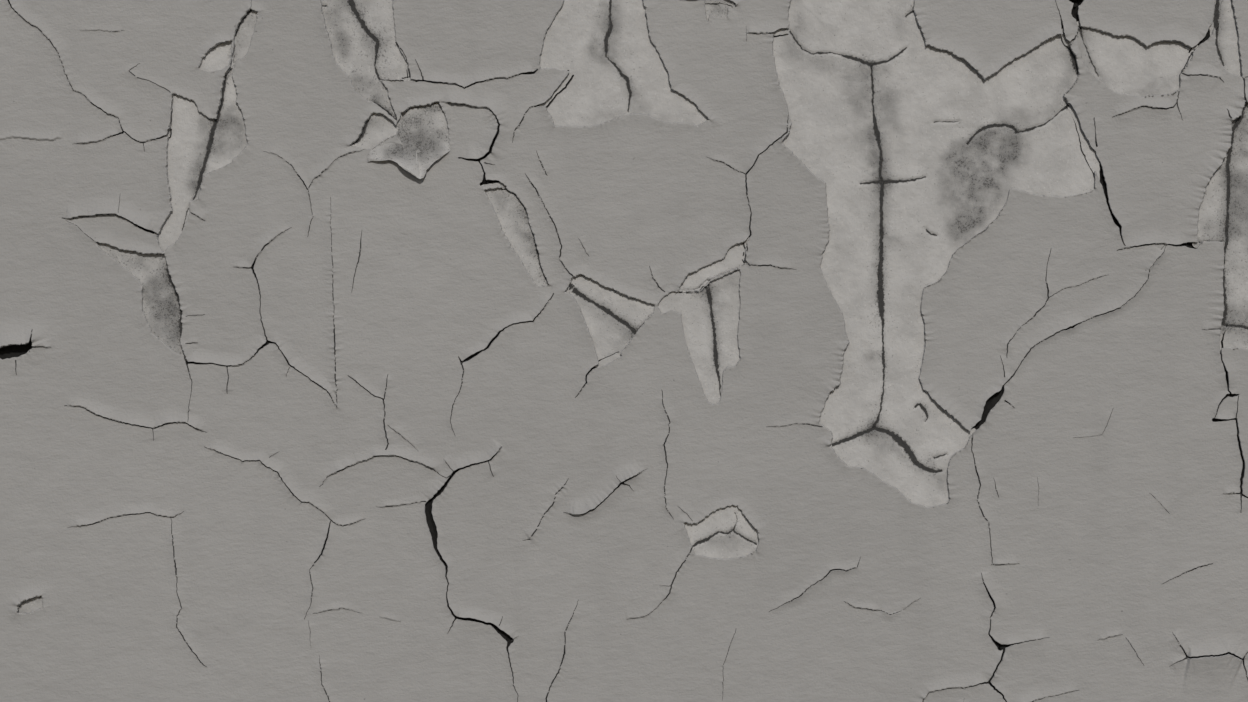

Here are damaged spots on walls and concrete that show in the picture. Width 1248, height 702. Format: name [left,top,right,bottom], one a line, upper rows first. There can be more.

peeling [7,586,52,621]
crack [0,0,173,151]
peeling [90,2,266,361]
crack [63,146,580,702]
crack [380,42,574,142]
peeling [313,0,755,404]
crack [575,352,619,398]
crack [626,391,695,620]
crack [707,115,797,270]
crack [769,560,919,612]
peeling [763,0,1248,509]
crack [913,0,1248,702]